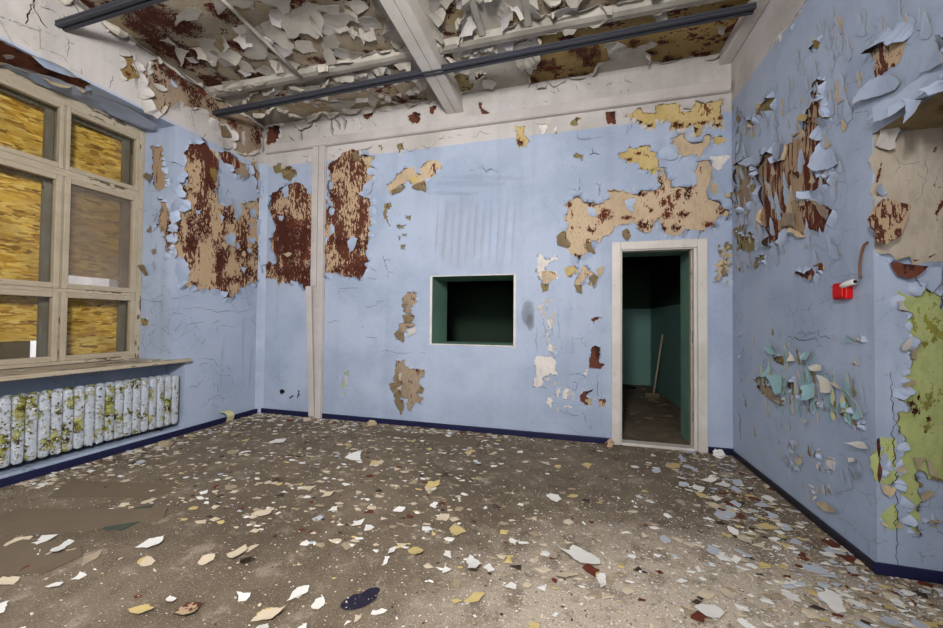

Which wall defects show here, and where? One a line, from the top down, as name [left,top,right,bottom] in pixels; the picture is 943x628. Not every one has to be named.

crack [25,0,82,73]
peeling [426,0,751,93]
peeling [0,0,442,304]
peeling [514,124,558,149]
peeling [532,0,943,538]
peeling [394,289,420,343]
peeling [388,358,428,415]